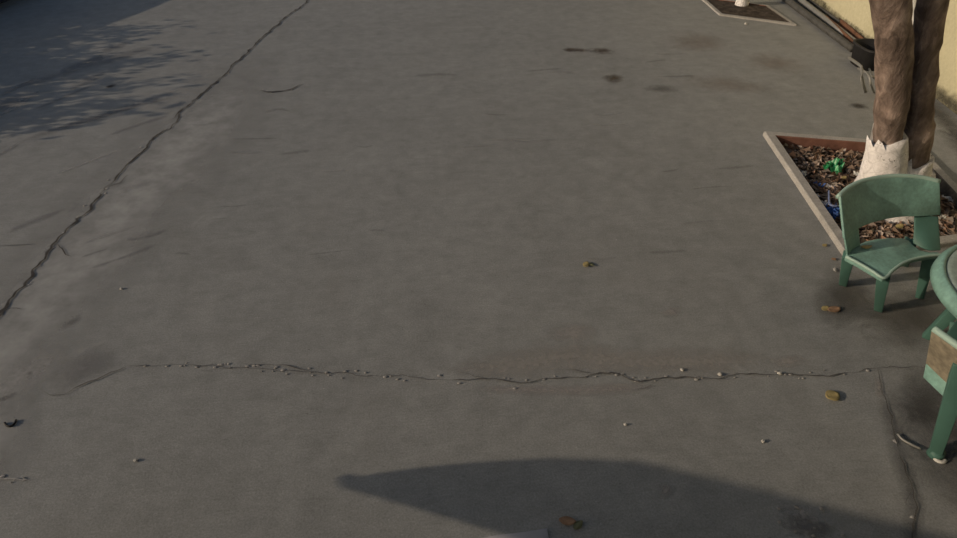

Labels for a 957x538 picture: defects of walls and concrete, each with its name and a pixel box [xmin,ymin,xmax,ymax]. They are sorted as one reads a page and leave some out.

crack [0,0,307,316]
crack [47,362,925,538]